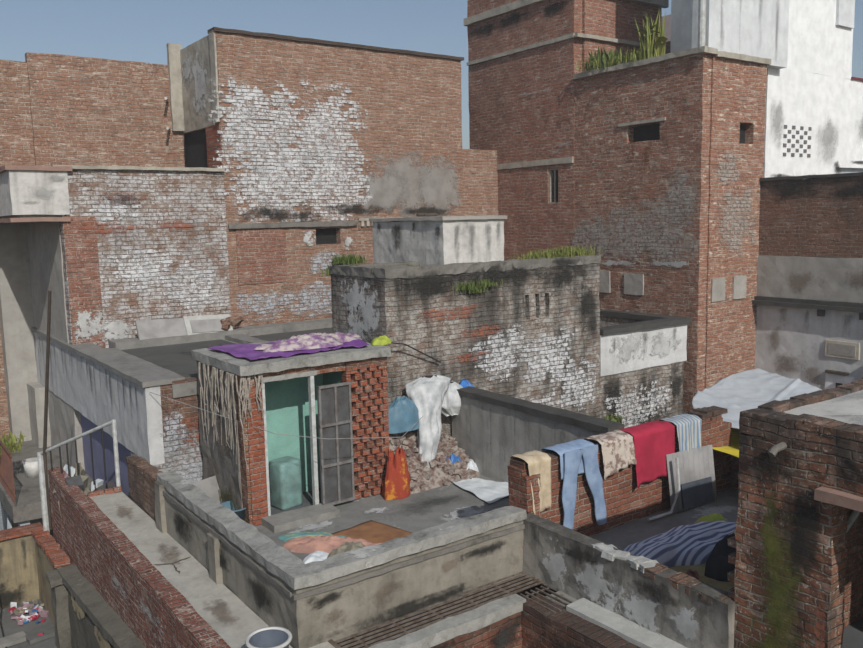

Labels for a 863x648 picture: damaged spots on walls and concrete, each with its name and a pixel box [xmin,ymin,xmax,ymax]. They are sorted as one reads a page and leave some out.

peeling [65,190,145,235]
damp [244,208,311,221]
peeling [182,49,380,339]
damp [329,204,379,214]
damp [406,207,445,231]
peeling [108,246,224,310]
peeling [73,310,133,345]
peeling [449,324,681,428]
damp [604,382,621,414]
damp [754,450,788,482]
spalling [591,543,658,573]
damp [248,579,272,611]